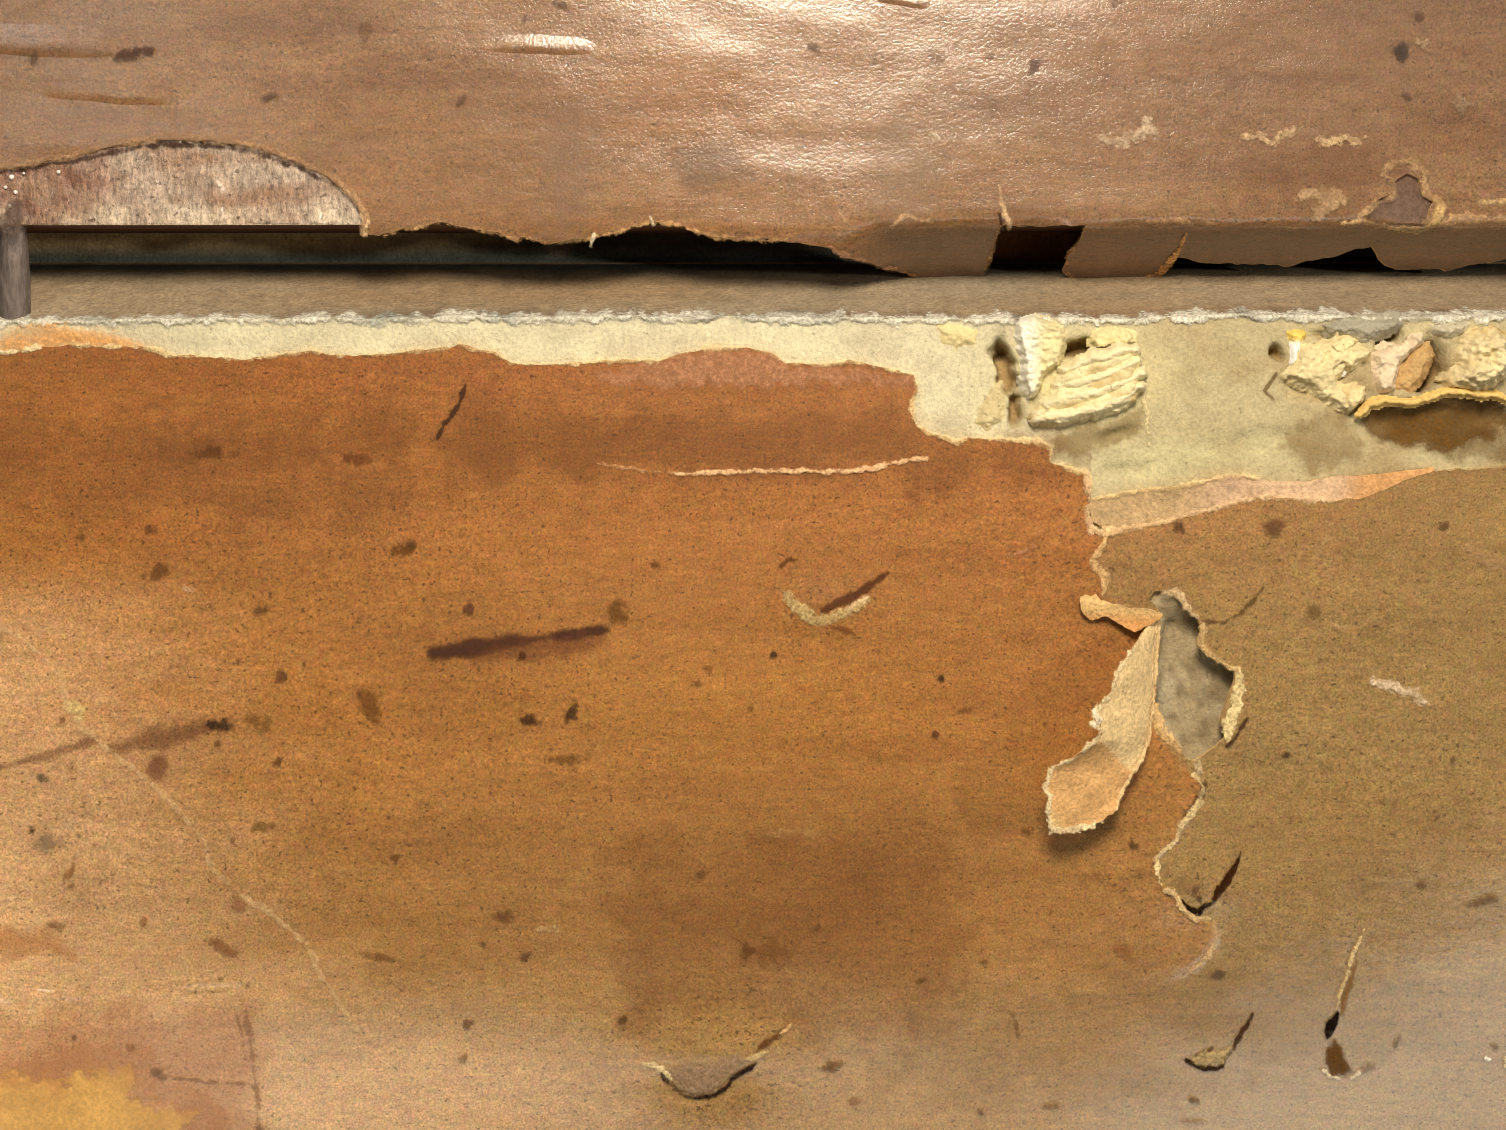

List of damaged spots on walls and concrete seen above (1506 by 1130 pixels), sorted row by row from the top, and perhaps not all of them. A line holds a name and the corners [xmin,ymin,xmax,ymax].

peeling [0,134,370,237]
peeling [1430,205,1447,228]
spalling [936,323,978,351]
spalling [974,313,1150,453]
spalling [1263,312,1506,458]
peeling [1042,594,1162,835]
crack [1163,852,1241,921]
water stain [0,1045,199,1130]